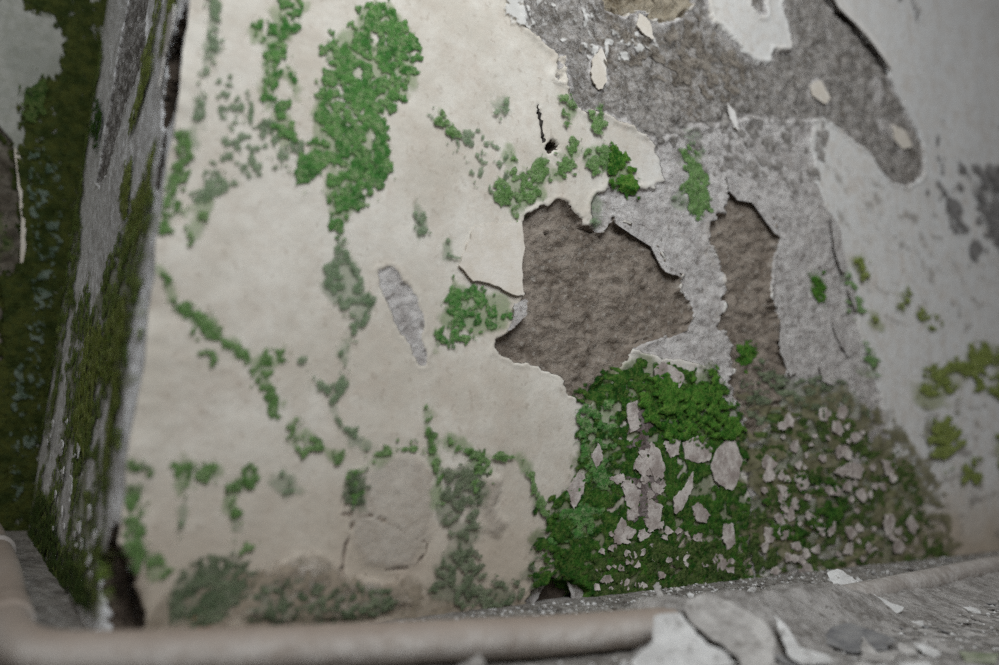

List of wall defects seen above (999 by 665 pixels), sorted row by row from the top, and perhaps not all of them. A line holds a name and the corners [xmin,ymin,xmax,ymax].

peeling [96,0,148,187]
crack [155,4,188,191]
crack [824,0,892,75]
spalling [0,128,26,276]
leakage [926,156,999,262]
peeling [458,0,926,585]
peeling [874,594,904,613]